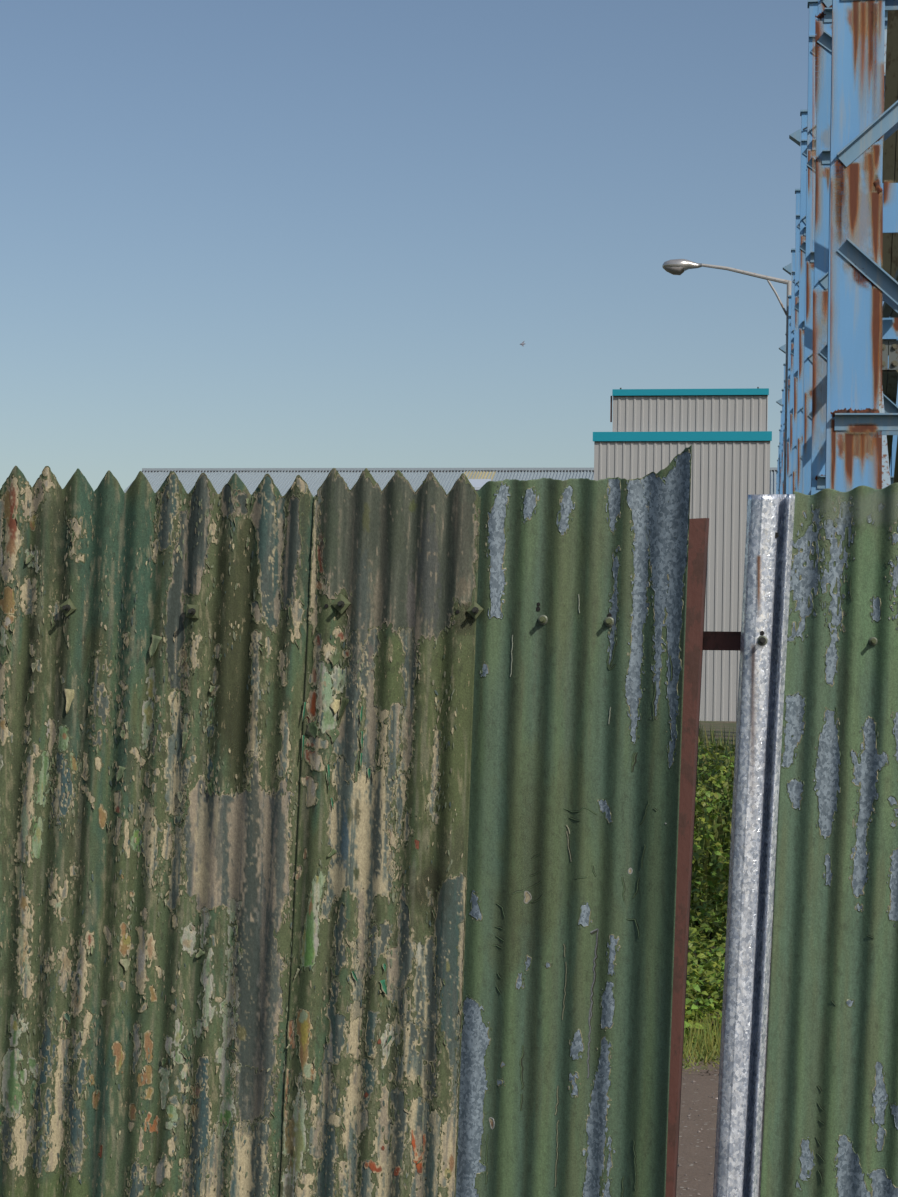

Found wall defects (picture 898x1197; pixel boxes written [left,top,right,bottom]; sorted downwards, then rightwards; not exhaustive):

rust [779,0,898,494]
peeling [484,481,540,620]
peeling [555,484,576,536]
peeling [604,449,692,769]
peeling [787,495,898,687]
peeling [0,466,506,1197]
peeling [577,901,593,930]
peeling [780,691,898,912]
peeling [567,934,621,1197]
peeling [795,1135,816,1191]
peeling [833,1133,898,1197]
peeling [870,1061,898,1153]